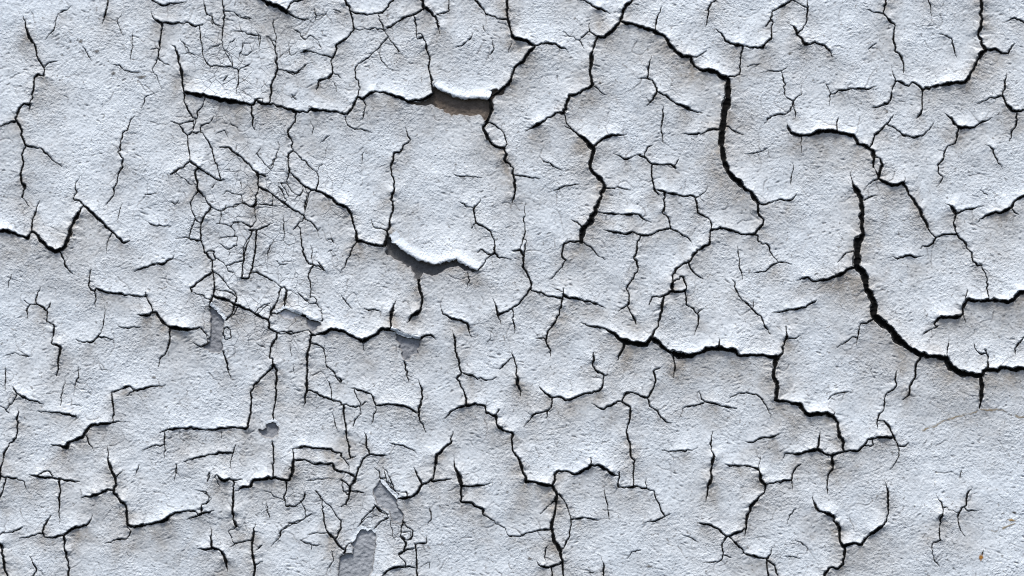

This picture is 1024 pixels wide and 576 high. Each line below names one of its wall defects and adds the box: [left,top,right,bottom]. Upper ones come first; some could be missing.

peeling [410,78,504,120]
peeling [386,230,481,279]
crack [0,0,671,576]
crack [457,0,1024,576]
peeling [374,479,403,523]
peeling [339,526,376,576]